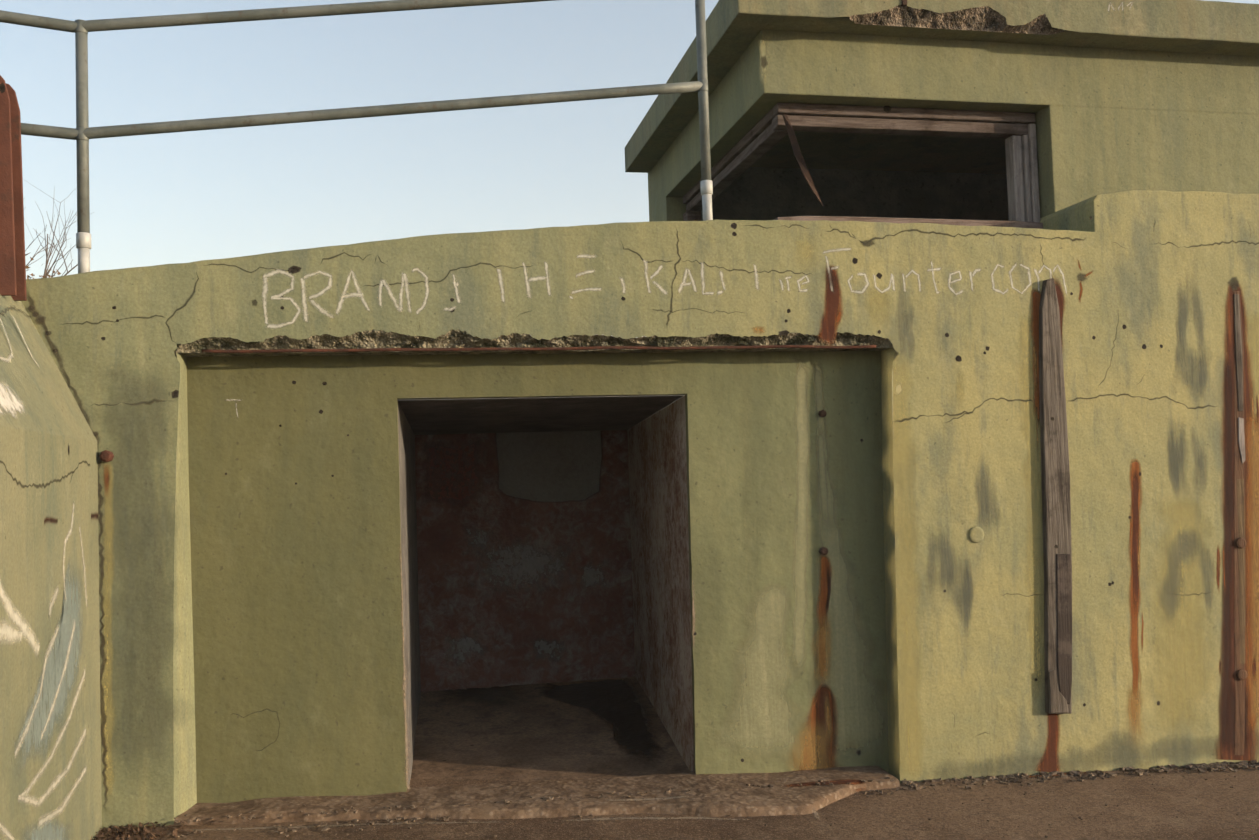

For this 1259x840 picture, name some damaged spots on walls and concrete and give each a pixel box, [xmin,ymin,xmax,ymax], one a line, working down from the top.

spalling [850,0,1064,35]
spalling [175,309,895,354]
crack [623,231,811,325]
rust [819,267,842,344]
crack [741,224,1083,264]
crack [1154,224,1259,248]
crack [899,398,1031,423]
crack [0,264,289,798]
rust [1216,284,1259,766]
rust [1129,460,1144,728]
rust [786,556,864,790]
rust [1029,713,1086,777]